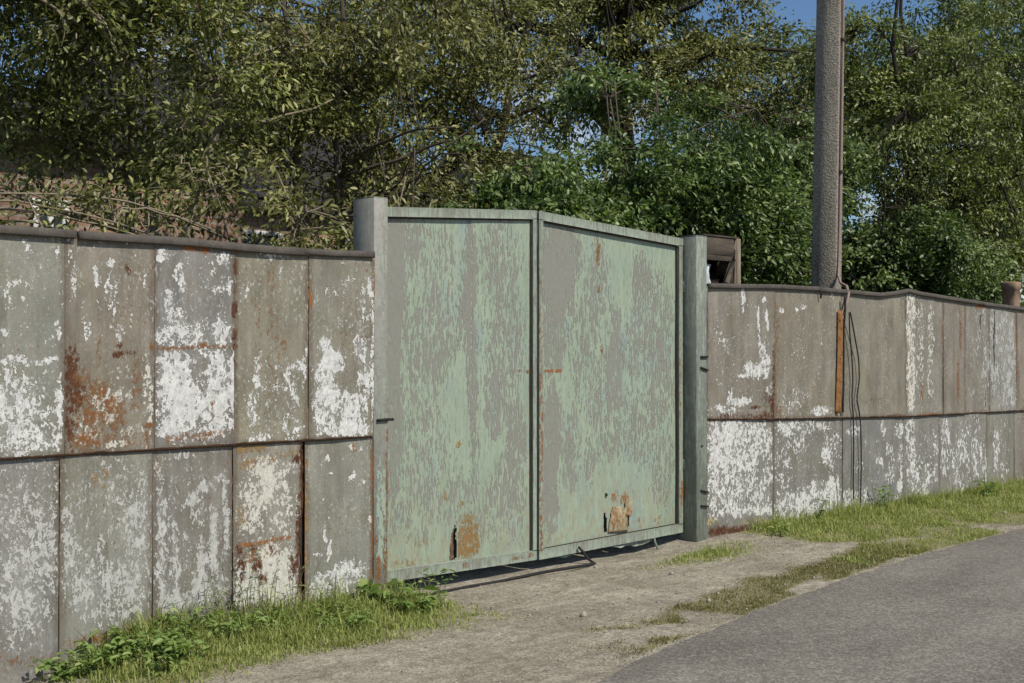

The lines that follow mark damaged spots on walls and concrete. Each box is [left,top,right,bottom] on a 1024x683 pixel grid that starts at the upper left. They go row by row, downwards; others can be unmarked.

rust [62,296,154,457]
rust [166,403,309,595]
peeling [0,213,530,653]
rust [456,502,481,569]
peeling [543,223,676,543]
peeling [707,289,1017,521]